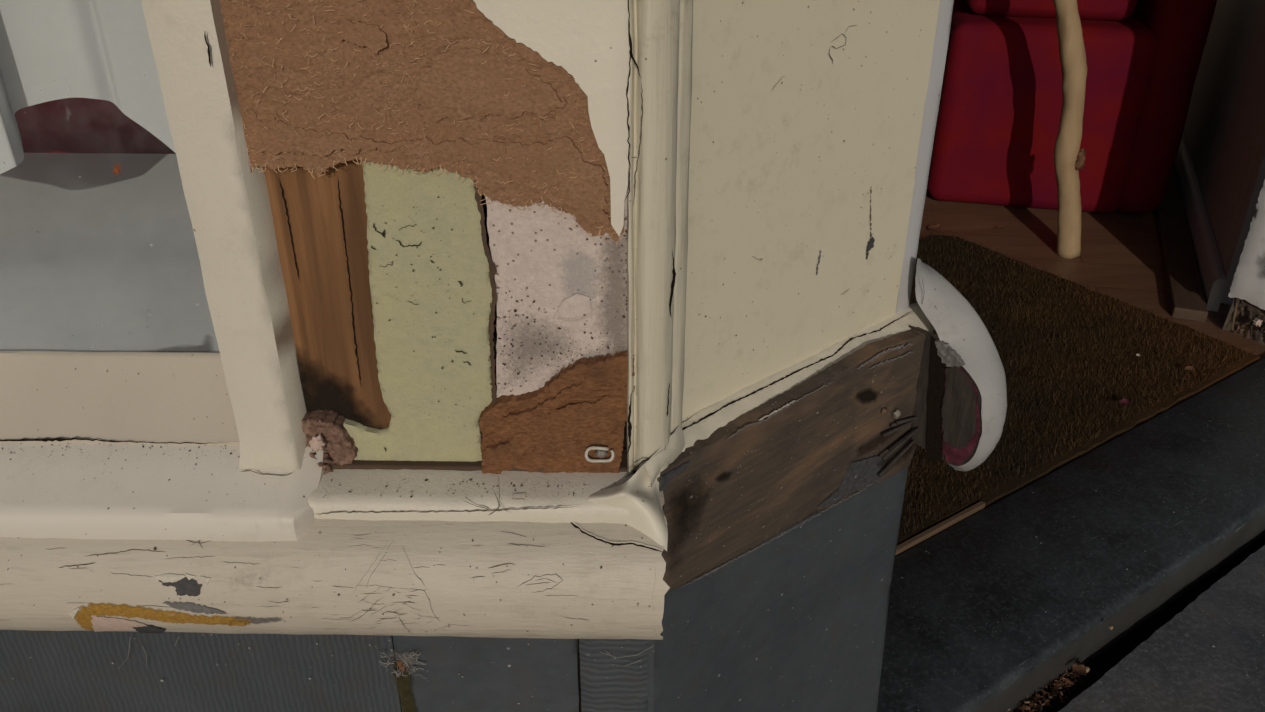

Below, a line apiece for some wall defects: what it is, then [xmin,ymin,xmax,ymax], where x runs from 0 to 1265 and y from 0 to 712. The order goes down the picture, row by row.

peeling [248,110,610,227]
crack [668,251,676,316]
peeling [482,395,626,474]
crack [626,284,983,478]
peeling [69,573,280,634]
crack [54,487,664,639]